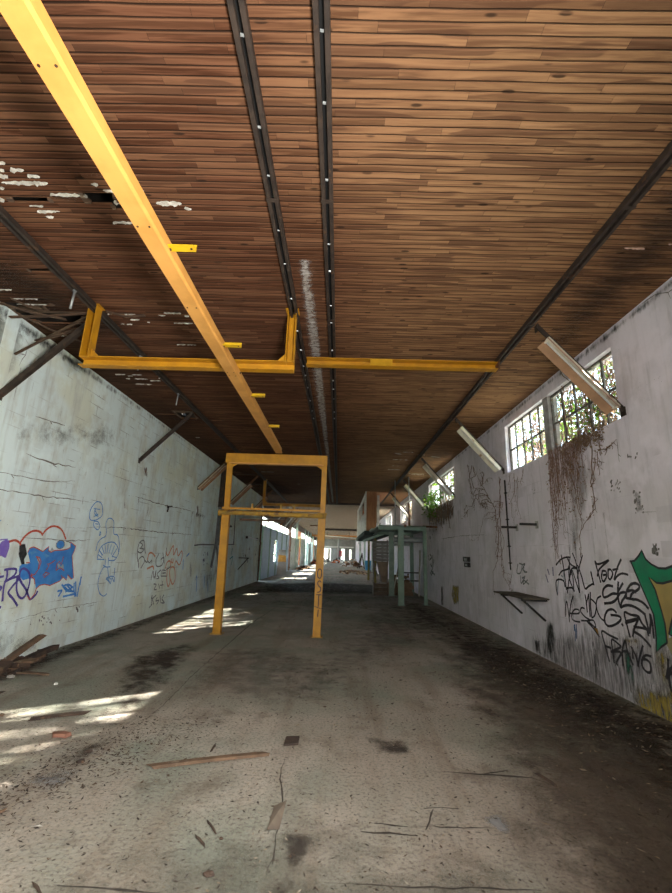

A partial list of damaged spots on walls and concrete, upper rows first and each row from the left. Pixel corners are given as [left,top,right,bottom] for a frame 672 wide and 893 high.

peeling [0,161,88,203]
peeling [29,205,60,219]
peeling [156,201,191,211]